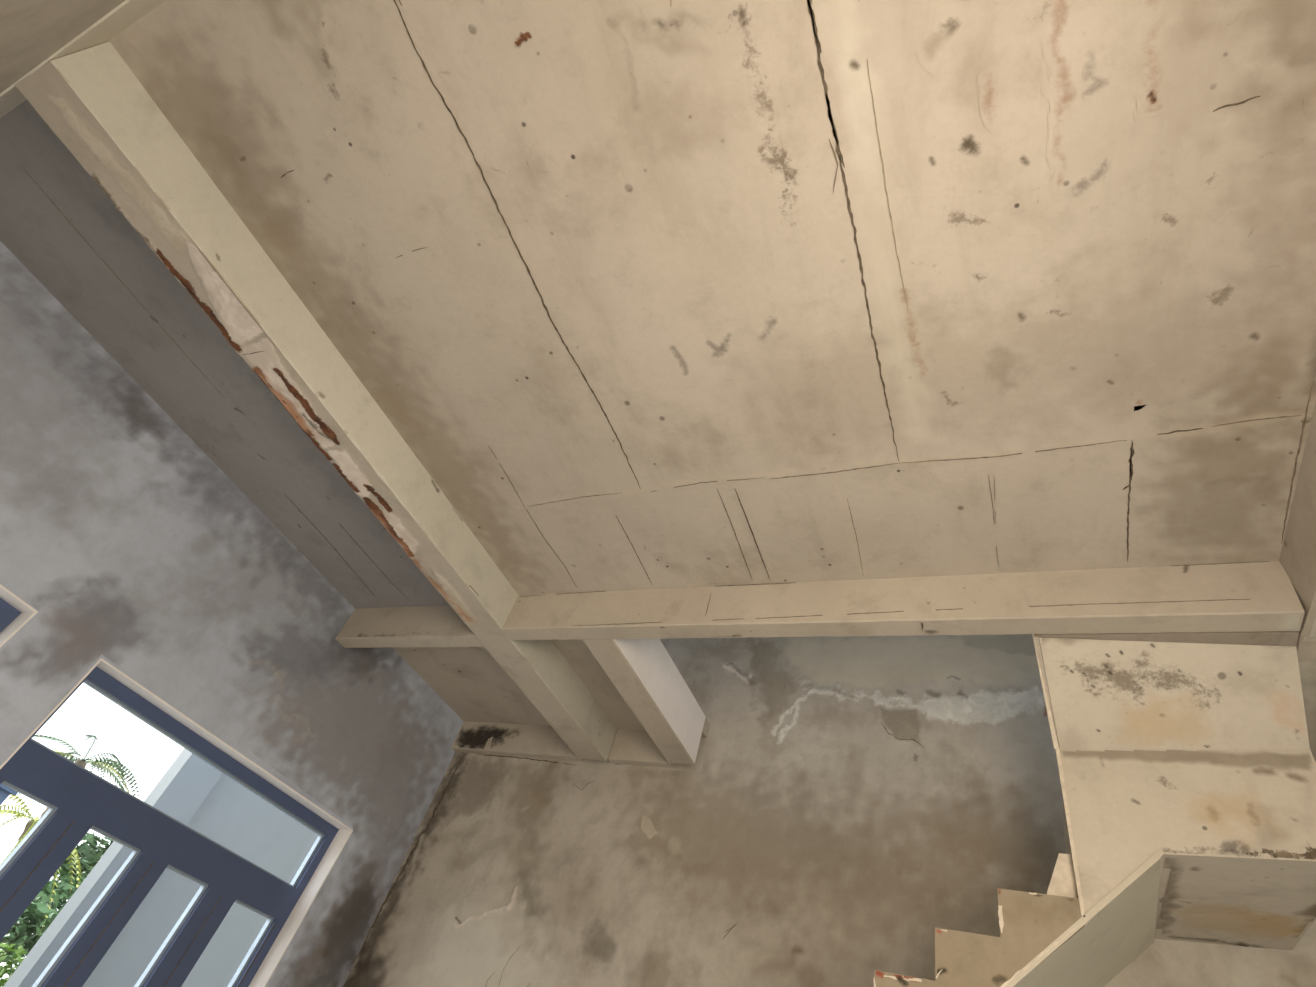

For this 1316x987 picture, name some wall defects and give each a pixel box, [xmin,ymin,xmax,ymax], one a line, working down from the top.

flaking render [43,87,324,418]
corrosion [153,245,480,625]
flaking render [319,441,480,629]
crack [394,0,641,489]
damp [0,241,1254,987]
damp [596,0,809,235]
crack [807,0,899,460]
damp [665,0,1316,568]
crack [1123,442,1135,560]